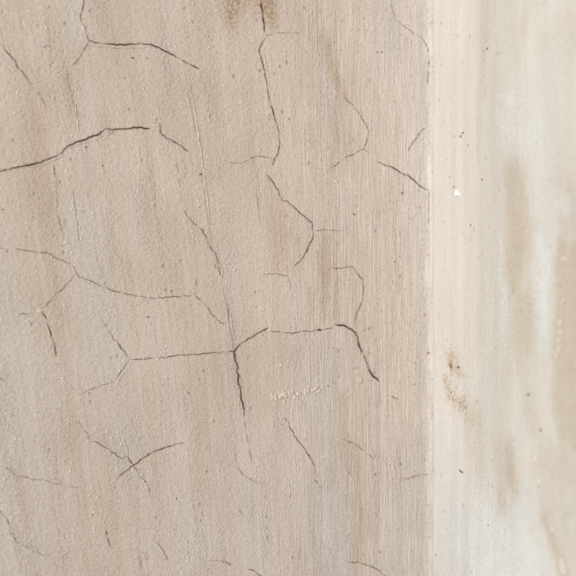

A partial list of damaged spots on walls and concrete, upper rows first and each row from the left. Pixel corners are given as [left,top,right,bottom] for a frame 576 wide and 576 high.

crack [80,0,199,69]
crack [3,105,188,174]
crack [259,3,314,265]
crack [380,162,429,196]
crack [36,304,56,355]
crack [112,337,178,386]
crack [195,266,379,416]
crack [91,436,182,490]